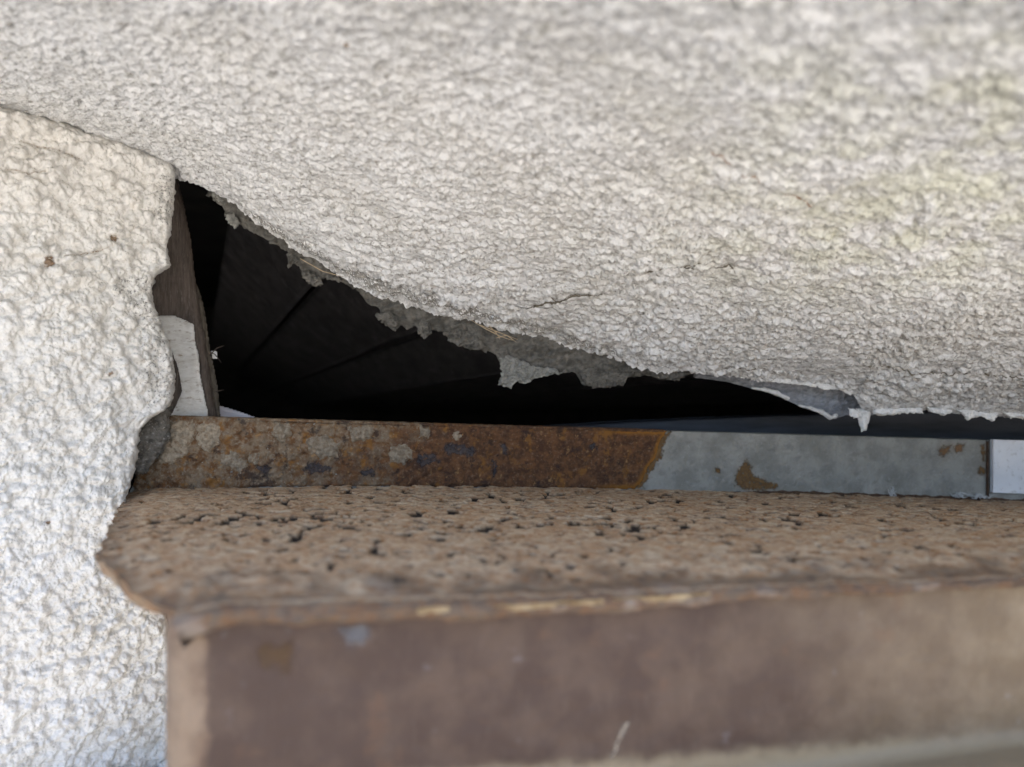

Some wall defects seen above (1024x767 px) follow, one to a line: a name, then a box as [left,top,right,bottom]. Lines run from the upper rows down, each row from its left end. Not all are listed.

flaking render [206,191,1024,432]
rust [132,415,671,492]
rust [734,460,778,491]